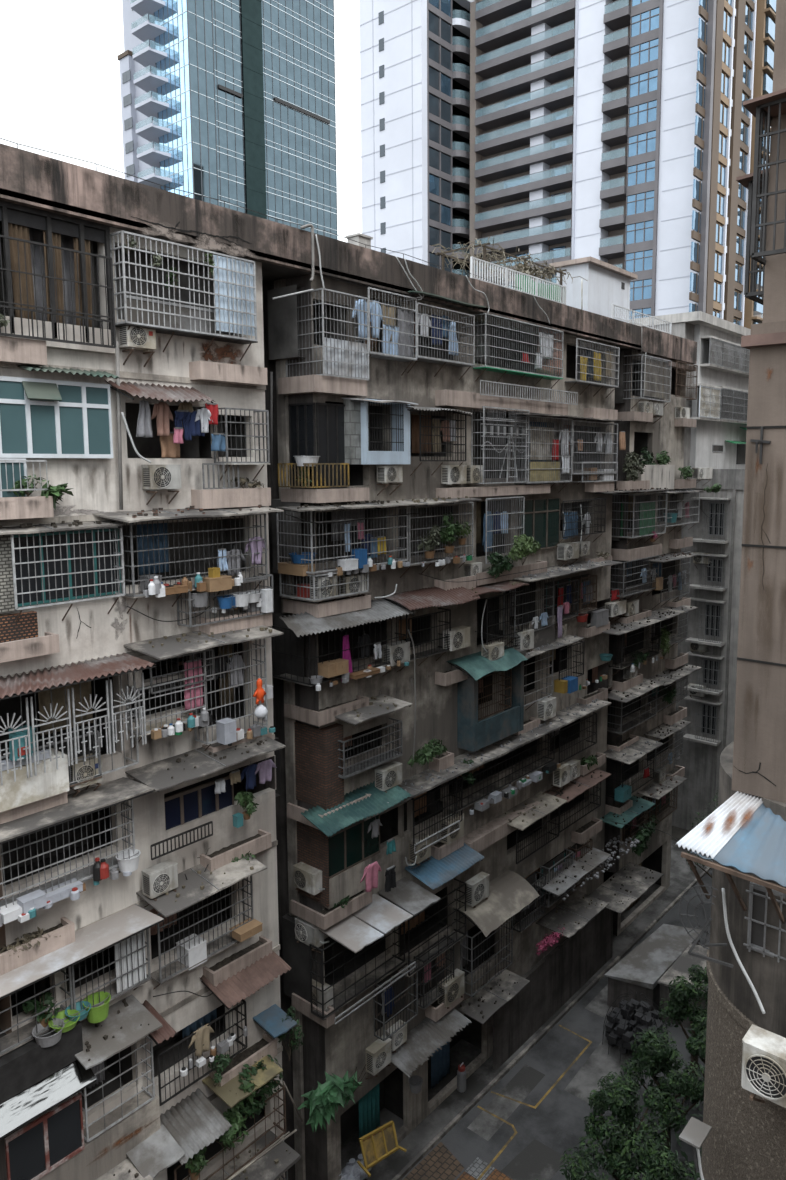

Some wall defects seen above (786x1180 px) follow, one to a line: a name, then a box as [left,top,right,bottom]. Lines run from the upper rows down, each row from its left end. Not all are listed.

corrosion [706,811,752,833]